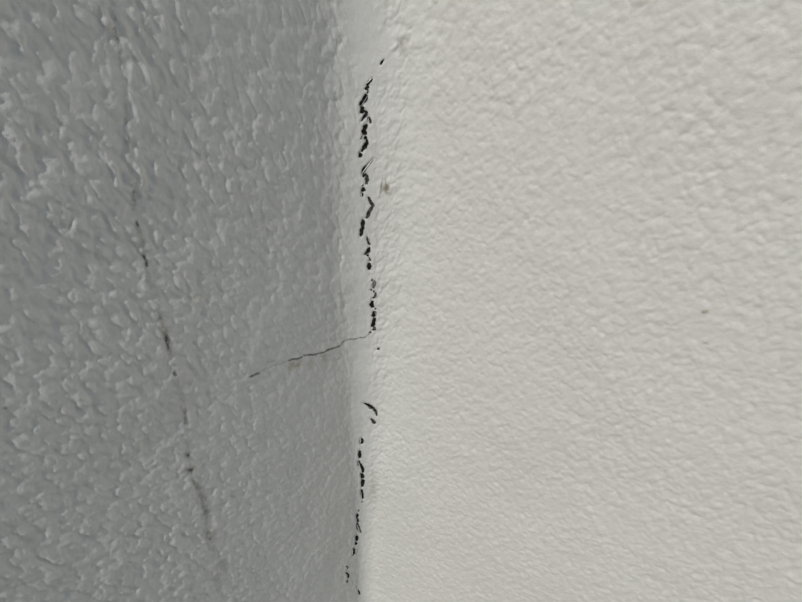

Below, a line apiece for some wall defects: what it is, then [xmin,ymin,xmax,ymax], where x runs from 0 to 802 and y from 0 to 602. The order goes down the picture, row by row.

crack [358,78,376,338]
crack [346,403,377,595]